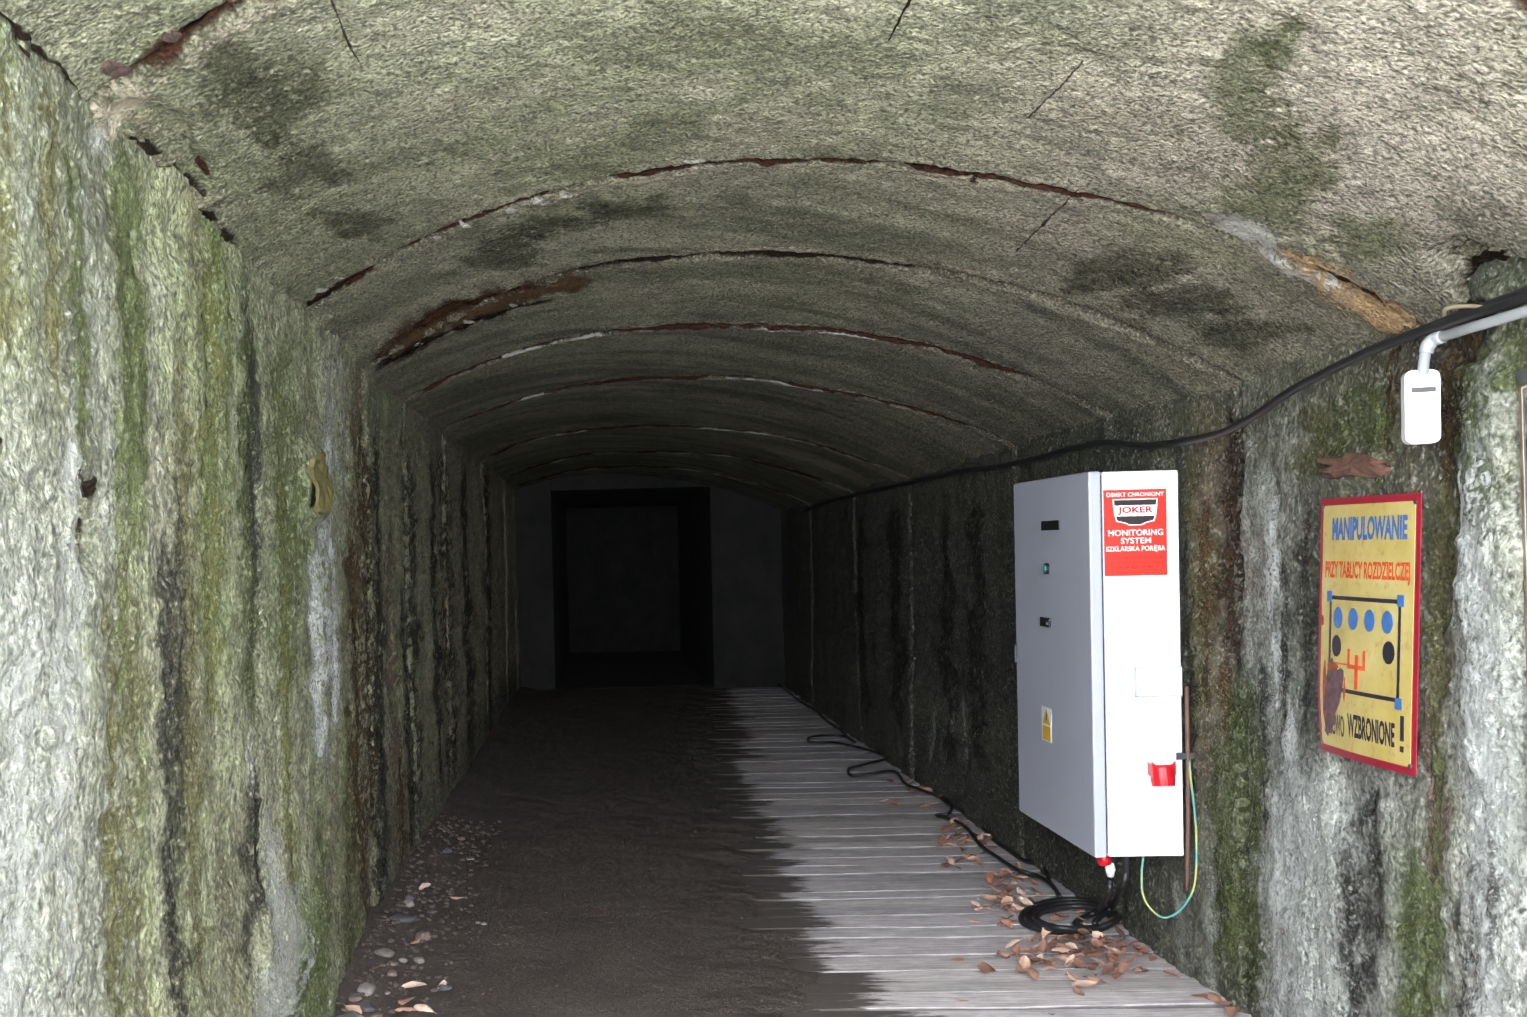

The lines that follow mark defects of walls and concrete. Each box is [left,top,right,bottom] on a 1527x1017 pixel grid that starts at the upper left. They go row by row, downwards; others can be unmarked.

crack [0,0,248,97]
crack [330,0,362,68]
crack [888,0,912,41]
crack [1514,0,1527,11]
crack [1026,60,1083,119]
crack [409,157,1160,252]
crack [530,246,981,280]
corrosion [371,272,591,368]
leakage [152,502,192,1017]